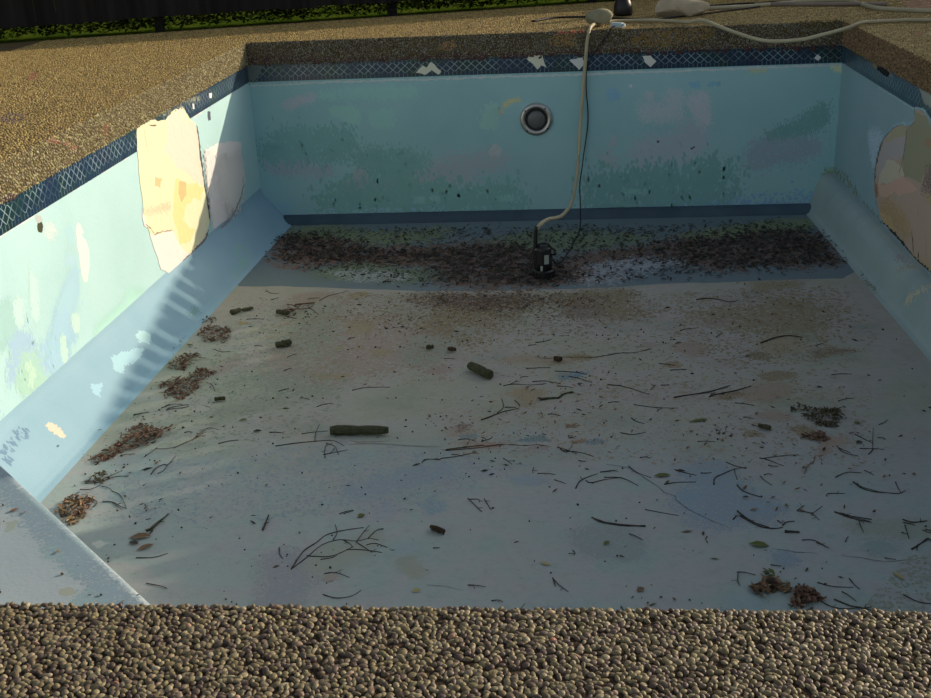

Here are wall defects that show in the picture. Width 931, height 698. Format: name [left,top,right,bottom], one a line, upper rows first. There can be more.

spalling [137,103,210,273]
spalling [867,89,931,274]